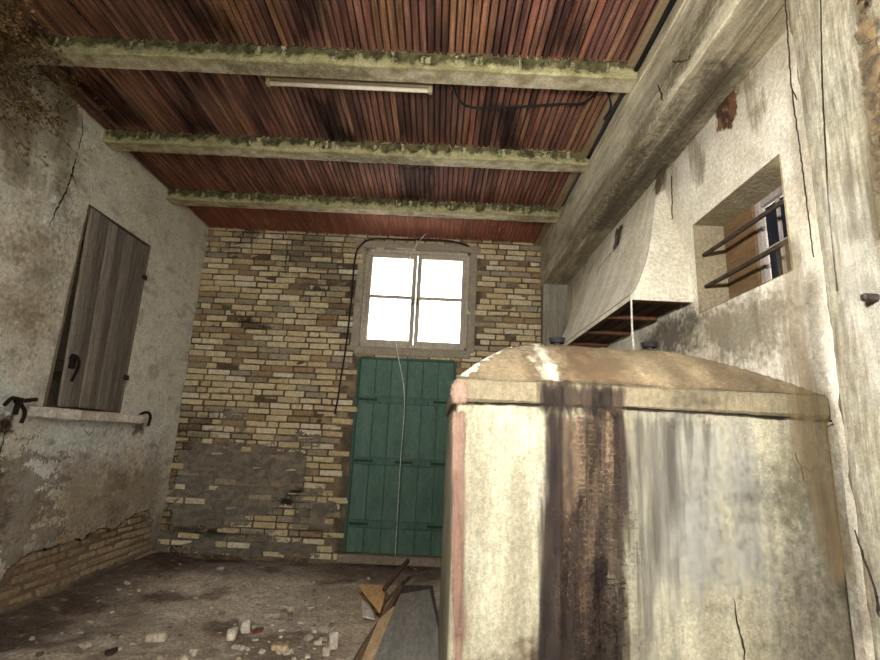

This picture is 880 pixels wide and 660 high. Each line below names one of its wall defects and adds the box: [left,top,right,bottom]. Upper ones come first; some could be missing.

spalling [854,0,880,194]
spalling [0,510,158,605]
water stain [524,343,678,660]
crack [733,598,746,660]